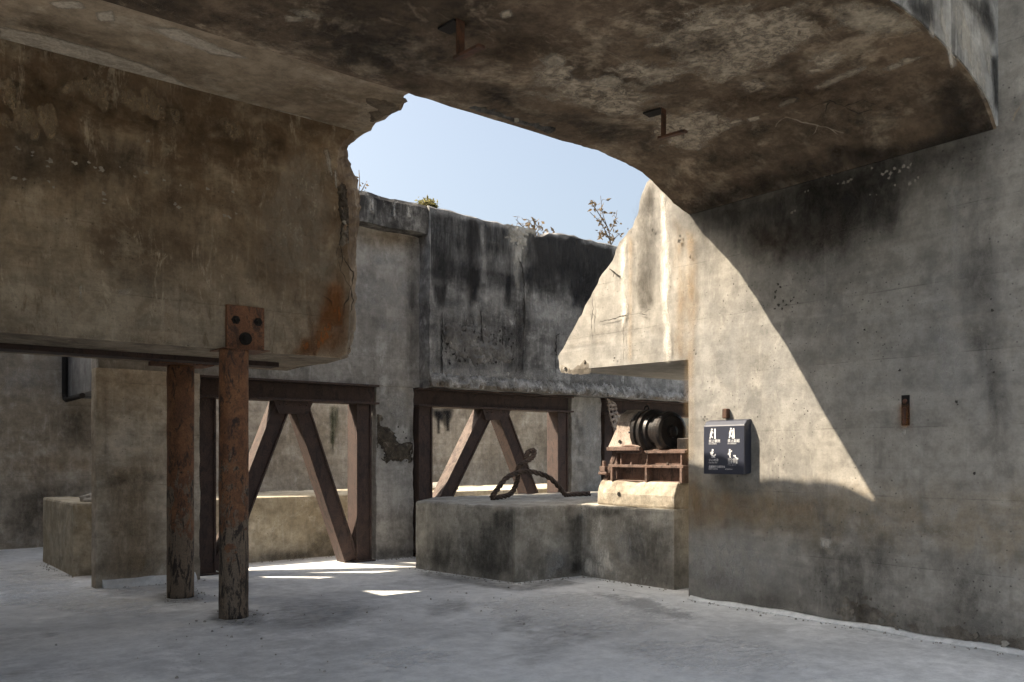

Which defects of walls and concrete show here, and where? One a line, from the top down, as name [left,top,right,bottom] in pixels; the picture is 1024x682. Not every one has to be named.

crack [322,227,354,315]
damp [432,220,607,319]
spalling [377,414,413,464]